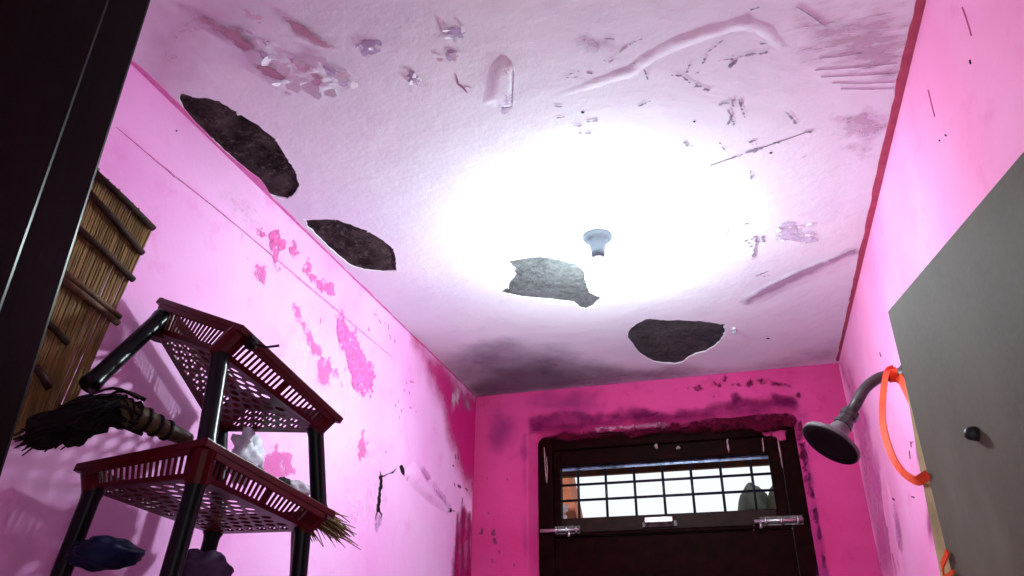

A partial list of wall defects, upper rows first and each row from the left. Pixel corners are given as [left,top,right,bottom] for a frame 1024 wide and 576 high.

flaking render [202,14,358,100]
flaking render [180,93,299,198]
flaking render [303,219,396,272]
flaking render [502,256,600,308]
peeling [255,228,376,398]
flaking render [628,319,726,365]
damp [473,354,674,392]
damp [695,376,800,405]
crack [375,469,396,520]